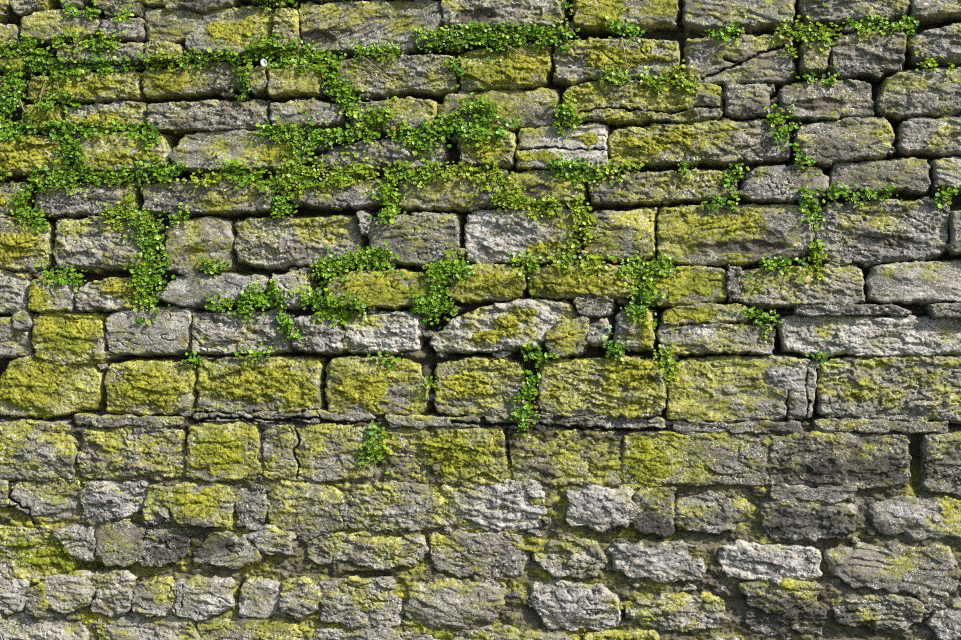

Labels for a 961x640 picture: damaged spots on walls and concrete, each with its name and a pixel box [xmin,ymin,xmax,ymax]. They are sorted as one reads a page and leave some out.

crack [195,415,377,479]
crack [7,481,36,524]